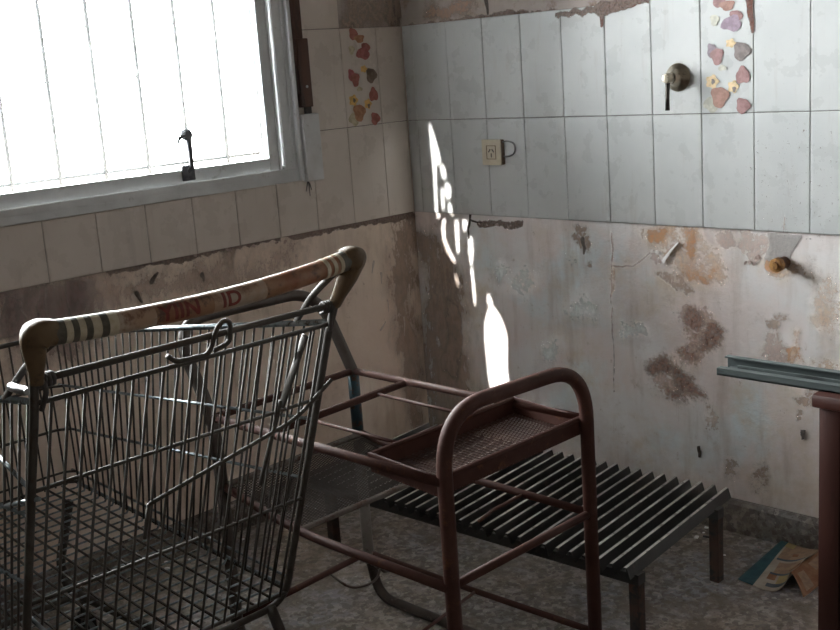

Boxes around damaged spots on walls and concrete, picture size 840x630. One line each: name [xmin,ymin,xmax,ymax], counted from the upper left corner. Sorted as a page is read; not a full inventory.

flaking render [406,0,649,26]
peeling [477,220,523,230]
spalling [573,226,590,254]
flaking render [650,242,679,263]
damp [389,216,468,428]
damp [677,306,724,363]
damp [647,357,707,402]